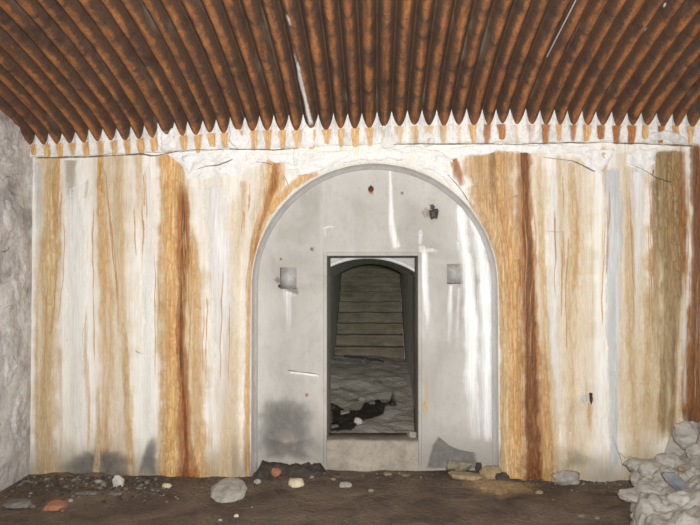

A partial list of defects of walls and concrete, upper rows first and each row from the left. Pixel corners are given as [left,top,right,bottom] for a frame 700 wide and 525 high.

corrosion [251,130,300,149]
corrosion [469,124,505,143]
crack [395,142,603,172]
corrosion [570,124,648,145]
crack [613,140,692,148]
damp [157,57,622,464]
corrosion [621,126,700,440]
corrosion [30,137,234,478]
corrosion [244,161,316,477]
corrosion [452,151,582,481]
damp [71,454,126,476]
damp [142,443,154,469]